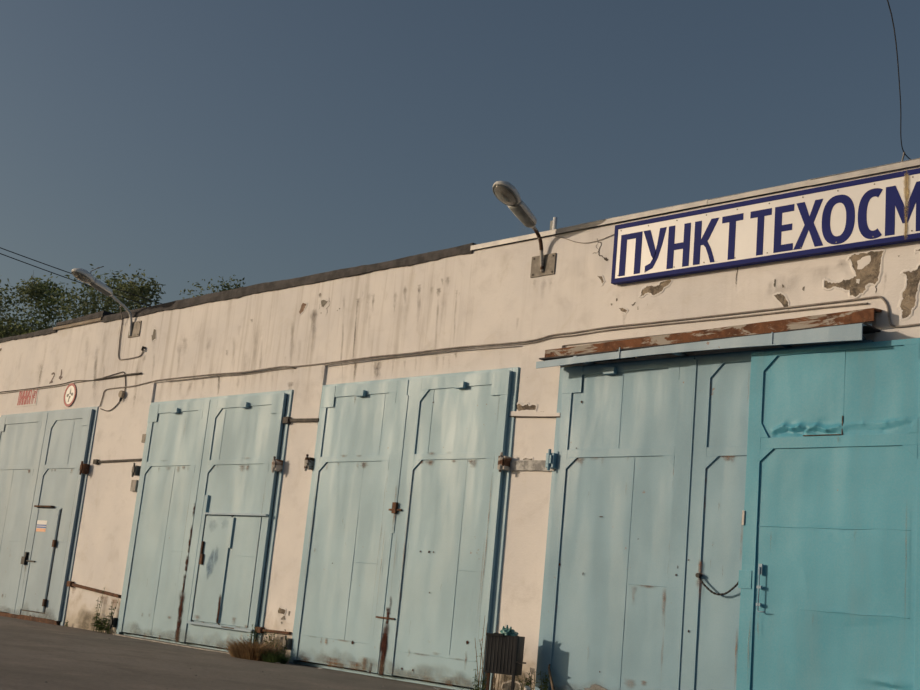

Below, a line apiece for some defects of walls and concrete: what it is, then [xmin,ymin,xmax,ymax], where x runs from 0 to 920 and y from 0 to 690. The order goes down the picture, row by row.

peeling [611,277,673,315]
peeling [822,248,886,299]
peeling [897,246,920,321]
rust [175,527,192,642]
rust [356,599,397,675]